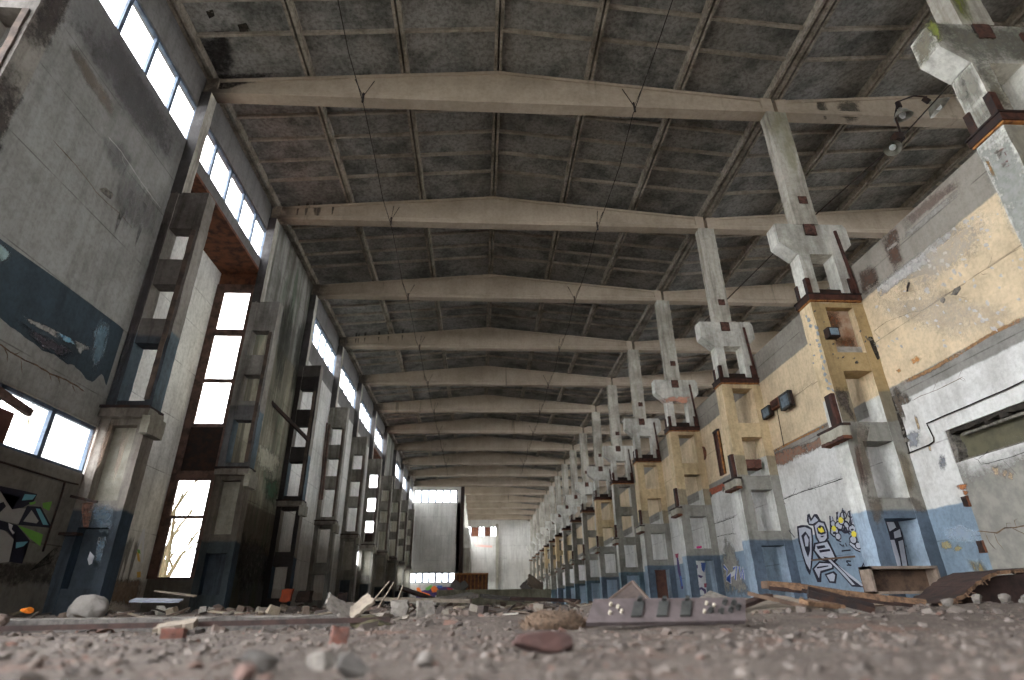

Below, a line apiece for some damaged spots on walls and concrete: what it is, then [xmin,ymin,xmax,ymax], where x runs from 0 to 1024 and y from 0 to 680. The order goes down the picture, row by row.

damp [203,31,234,73]
peeling [0,239,124,385]
spalling [892,398,910,452]
crack [978,520,1024,550]